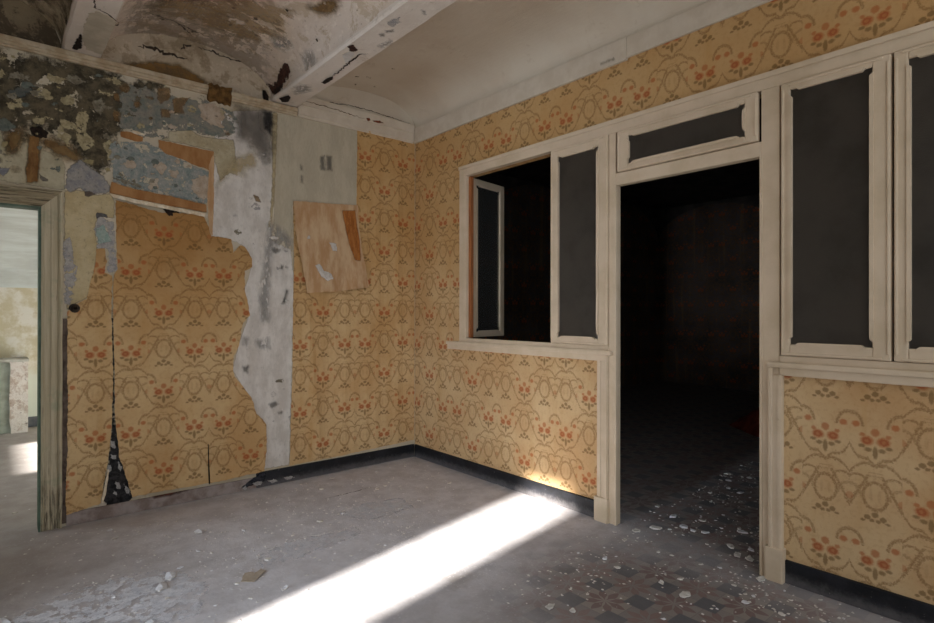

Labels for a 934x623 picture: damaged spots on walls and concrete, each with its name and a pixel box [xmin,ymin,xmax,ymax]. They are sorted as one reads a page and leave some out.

water stain [0,48,207,174]
crack [138,12,241,62]
spalling [321,45,361,84]
flaking render [0,52,357,490]